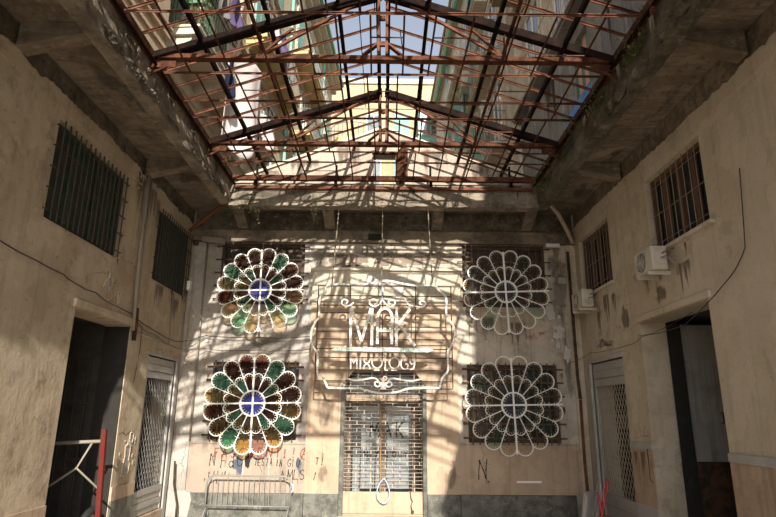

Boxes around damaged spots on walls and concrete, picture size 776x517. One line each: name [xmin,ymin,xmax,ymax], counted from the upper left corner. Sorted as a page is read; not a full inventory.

peeling [321,249,455,295]